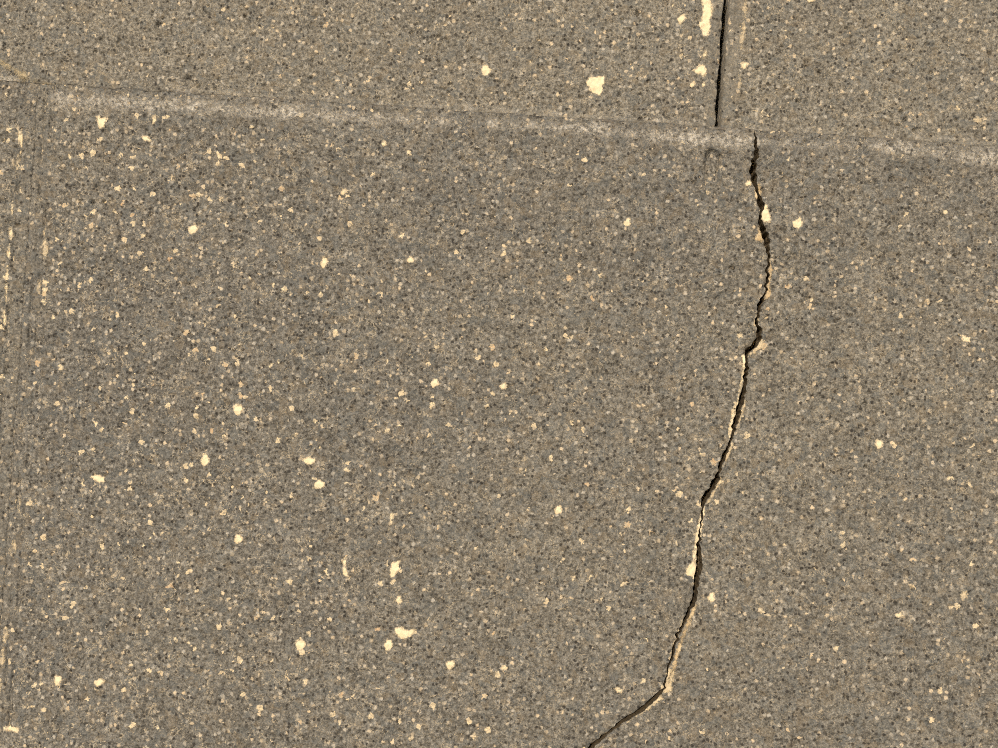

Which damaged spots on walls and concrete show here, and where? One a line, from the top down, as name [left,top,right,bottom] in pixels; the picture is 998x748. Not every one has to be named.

crack [583,130,772,748]